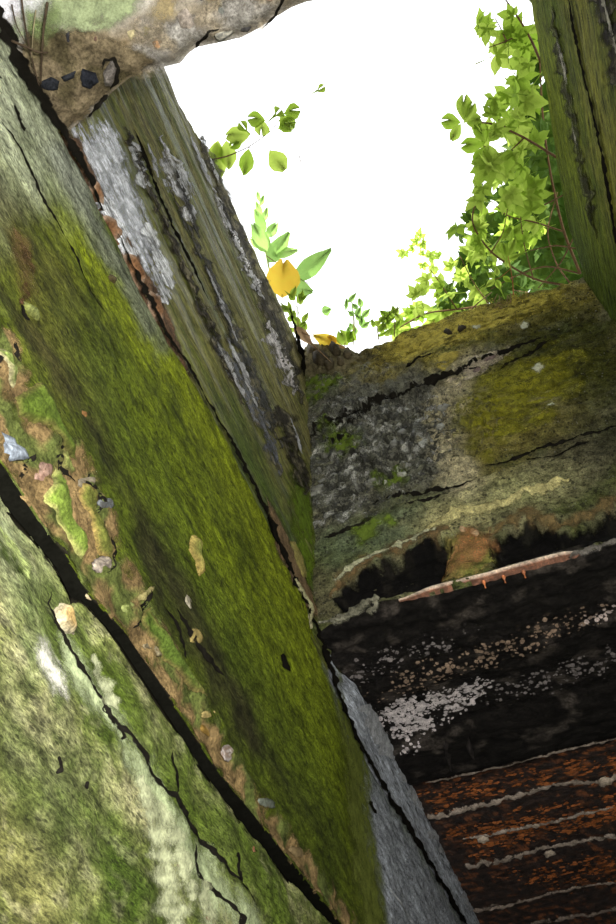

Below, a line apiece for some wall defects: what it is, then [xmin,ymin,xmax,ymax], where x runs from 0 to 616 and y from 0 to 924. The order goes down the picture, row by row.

crack [0,6,108,315]
crack [134,130,209,300]
crack [568,0,616,244]
crack [0,442,341,924]
spalling [0,328,359,924]
crack [118,234,467,924]
crack [310,337,550,444]
crack [324,425,616,538]
spalling [330,496,616,612]
peeling [339,604,616,810]
rust [417,752,616,860]
rust [497,849,616,894]